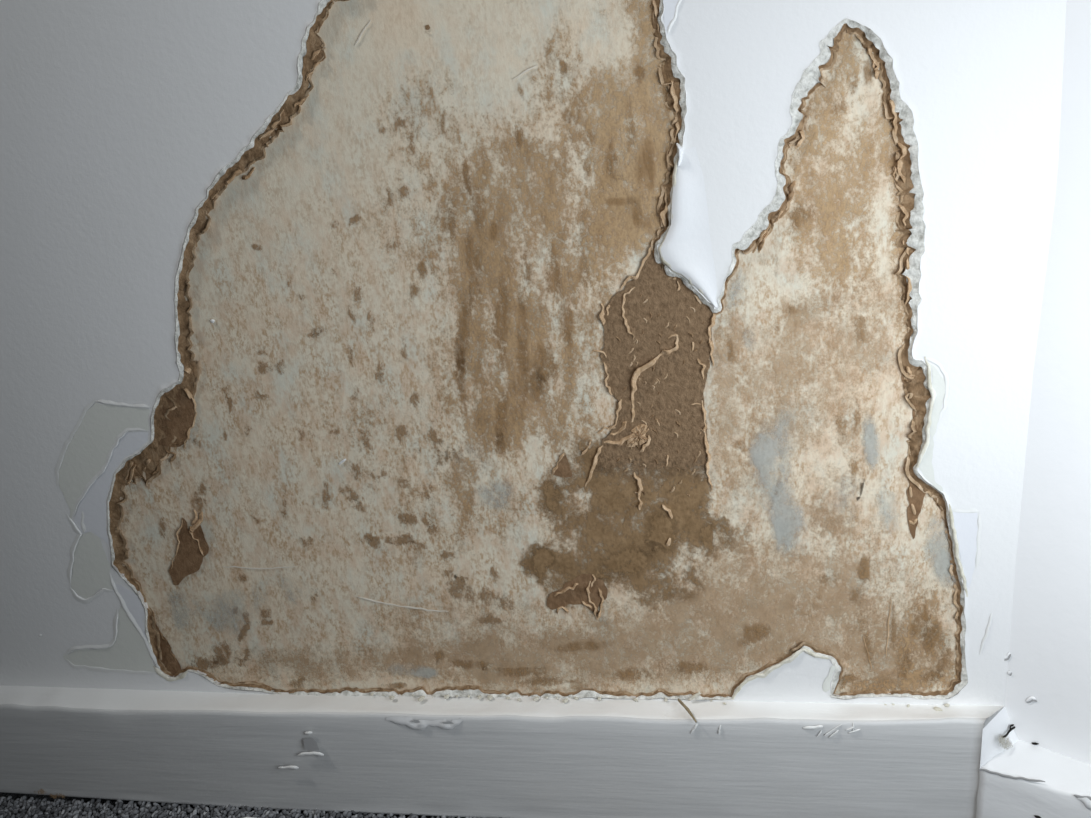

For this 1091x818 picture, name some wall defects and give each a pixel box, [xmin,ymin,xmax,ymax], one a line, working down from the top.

spalling [63,0,982,700]
water stain [259,0,957,692]
peeling [298,731,324,756]